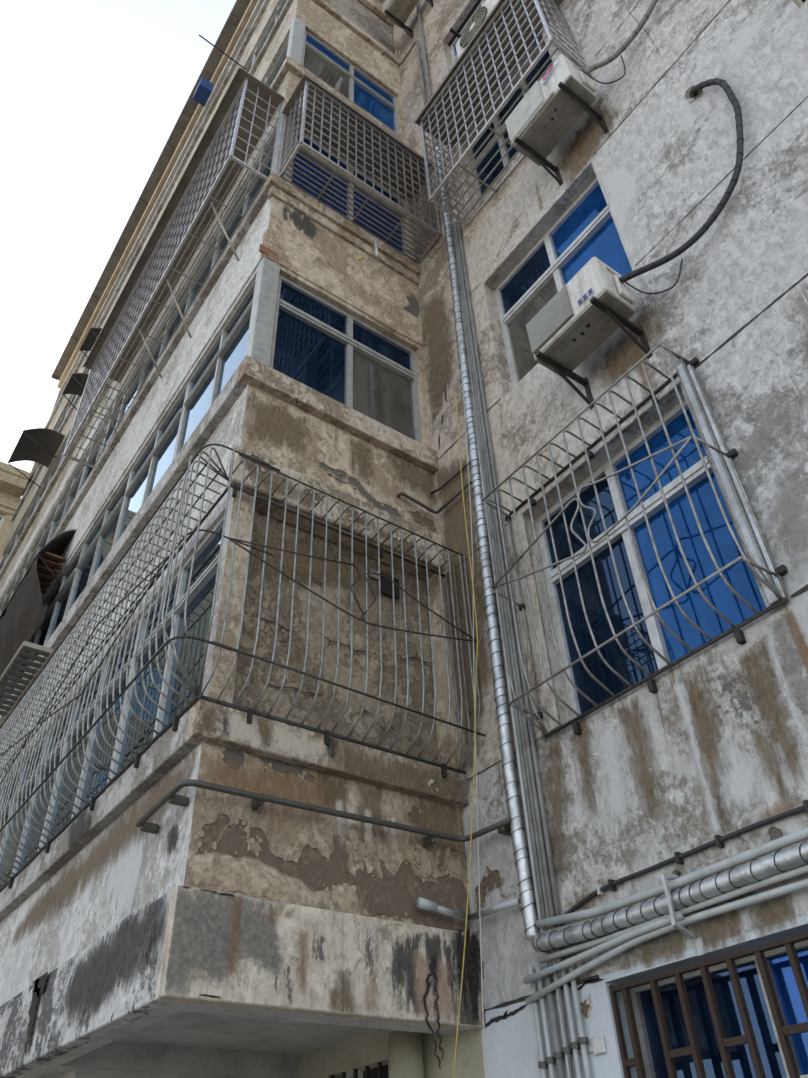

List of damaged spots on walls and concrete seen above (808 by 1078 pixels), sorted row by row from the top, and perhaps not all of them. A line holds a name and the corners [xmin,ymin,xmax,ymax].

damp [674,621,808,832]
damp [202,739,464,859]
damp [13,754,293,1021]
damp [312,932,325,960]
flaking render [195,813,504,933]
damp [358,931,486,1025]